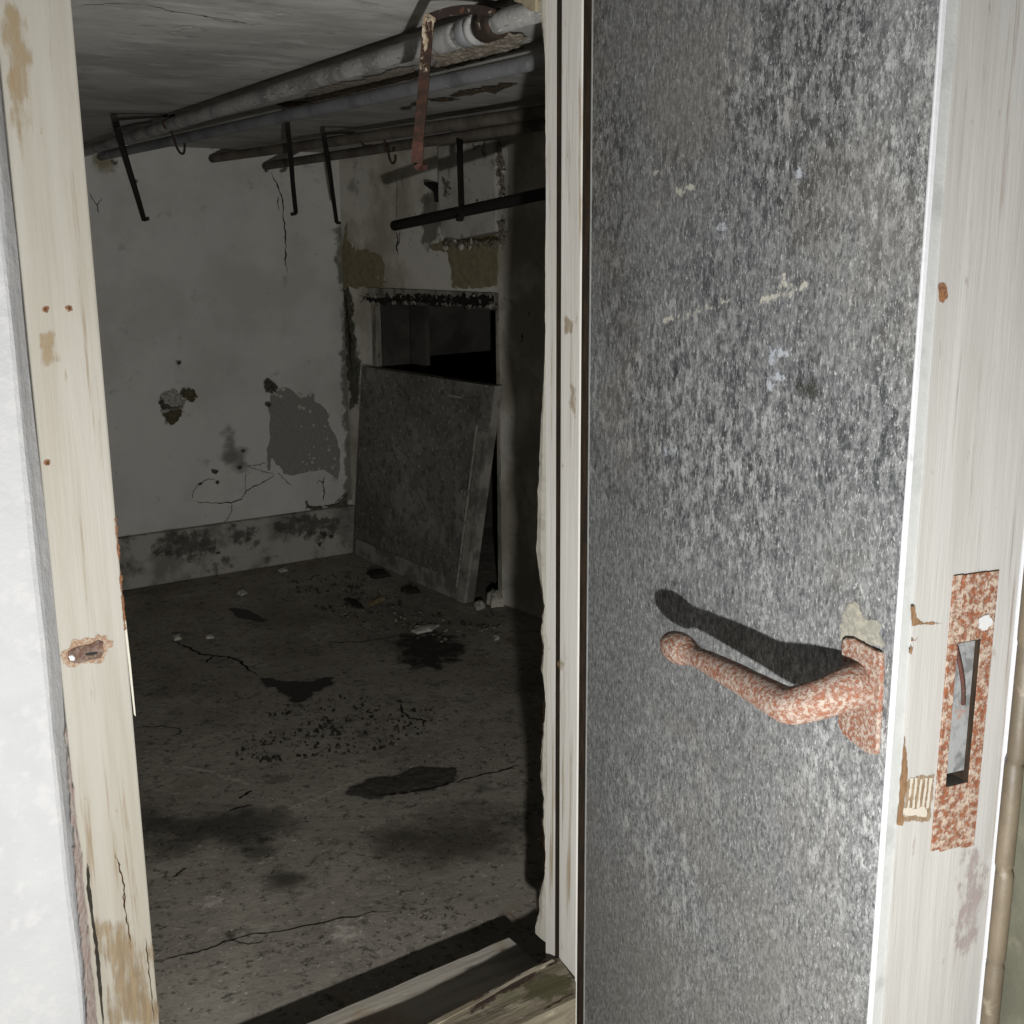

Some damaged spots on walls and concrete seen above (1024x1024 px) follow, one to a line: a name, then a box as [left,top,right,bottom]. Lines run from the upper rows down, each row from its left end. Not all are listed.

crack [272,175,288,273]
peeling [342,138,507,310]
corrosion [938,283,948,303]
spalling [158,387,198,426]
peeling [264,378,340,480]
crack [192,463,347,522]
corrosion [61,634,113,668]
water stain [260,672,346,703]
water stain [394,632,465,670]
peeling [897,737,933,826]
crack [88,866,104,1024]
crack [115,855,393,1023]